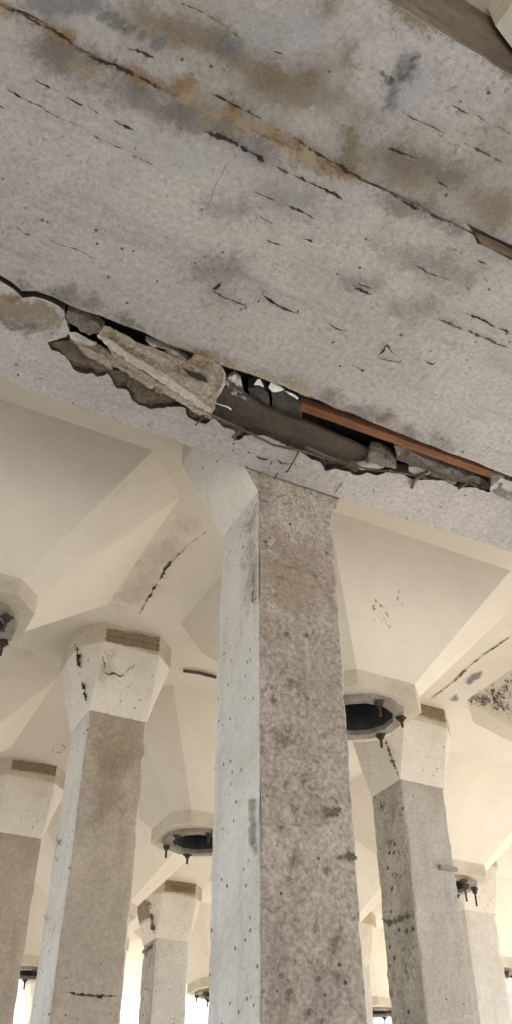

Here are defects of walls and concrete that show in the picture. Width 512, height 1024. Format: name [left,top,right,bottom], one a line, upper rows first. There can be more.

crack [4,7,163,92]
damp [382,55,421,111]
crack [0,79,163,165]
corrosion [118,64,364,185]
crack [191,90,488,265]
spalling [50,305,512,501]
crack [139,537,199,614]
crack [74,643,135,702]
crack [434,637,510,697]
damp [469,674,512,717]
crack [385,740,398,775]
crack [69,991,115,999]